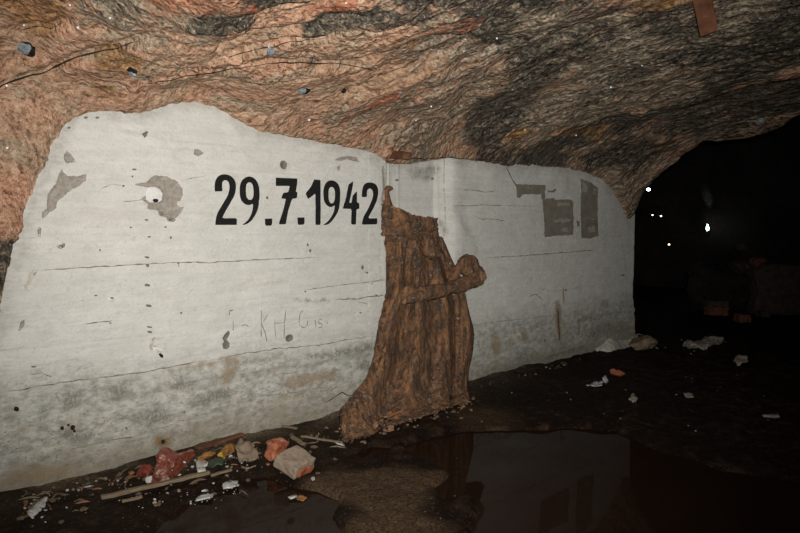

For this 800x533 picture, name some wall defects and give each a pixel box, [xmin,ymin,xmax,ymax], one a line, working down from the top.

flaking render [37,151,86,237]
flaking render [132,168,184,239]